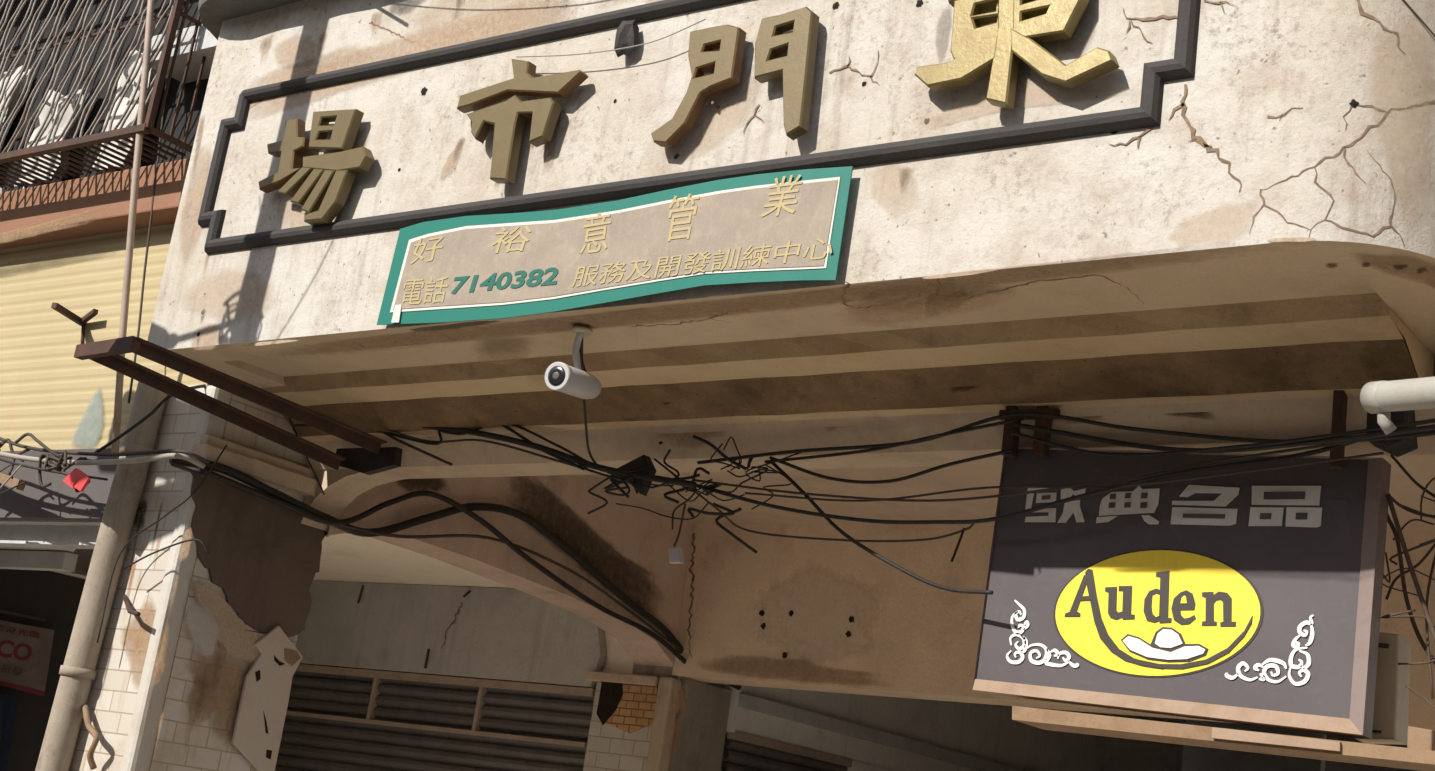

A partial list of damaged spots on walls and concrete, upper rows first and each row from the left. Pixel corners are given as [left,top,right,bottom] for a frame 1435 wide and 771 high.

crack [1109,84,1435,247]
leakage [1362,258,1435,288]
leakage [397,478,444,491]
leakage [519,480,652,611]
flaking render [187,581,267,662]
spalling [597,672,659,733]